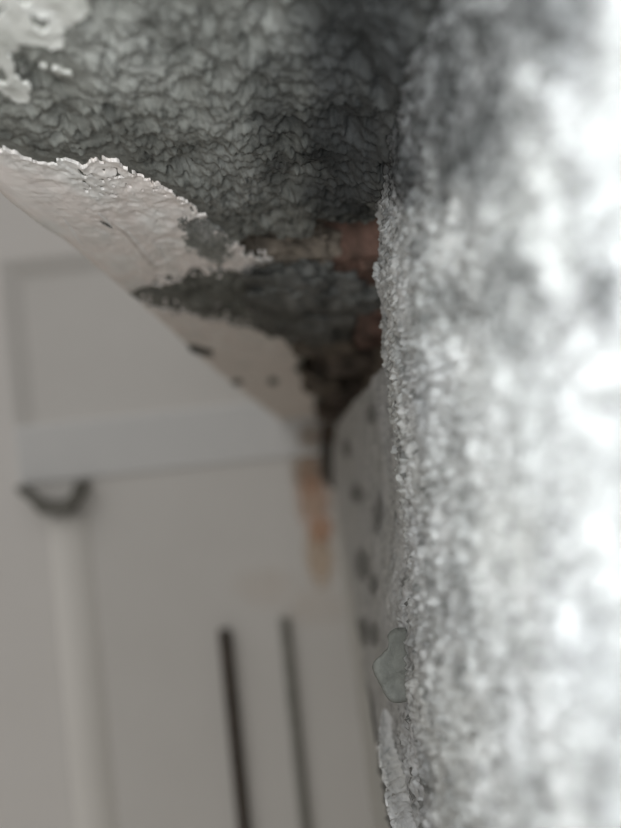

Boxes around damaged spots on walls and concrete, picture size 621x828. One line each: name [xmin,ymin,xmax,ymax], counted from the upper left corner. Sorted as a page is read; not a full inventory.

peeling [0,0,91,104]
flaking render [0,145,384,442]